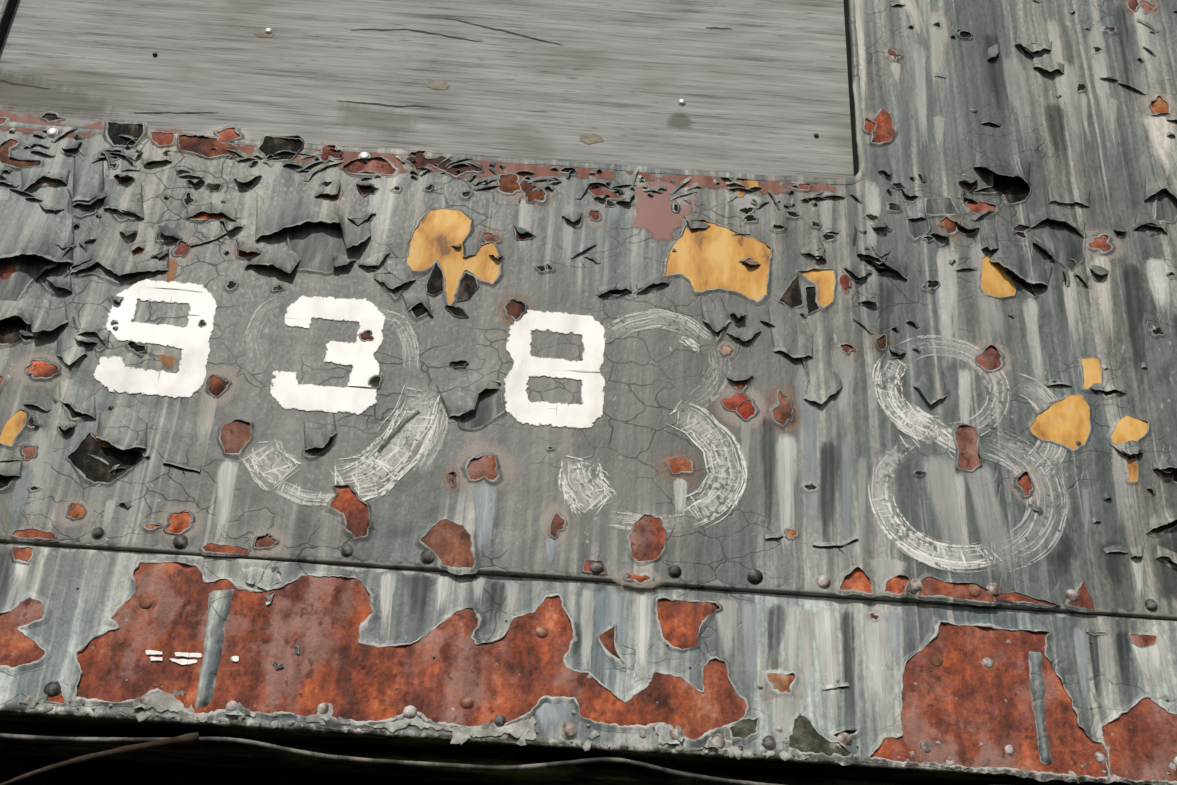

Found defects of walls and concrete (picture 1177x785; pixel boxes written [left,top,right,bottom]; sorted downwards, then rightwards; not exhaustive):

peeling [1111,176,1177,239]
peeling [0,111,1109,495]
rust [950,422,984,474]
peeling [1027,356,1177,494]
rust [65,502,88,522]
rust [324,483,374,543]
peeling [1104,507,1177,569]
rust [0,509,752,750]
rust [833,565,1177,785]